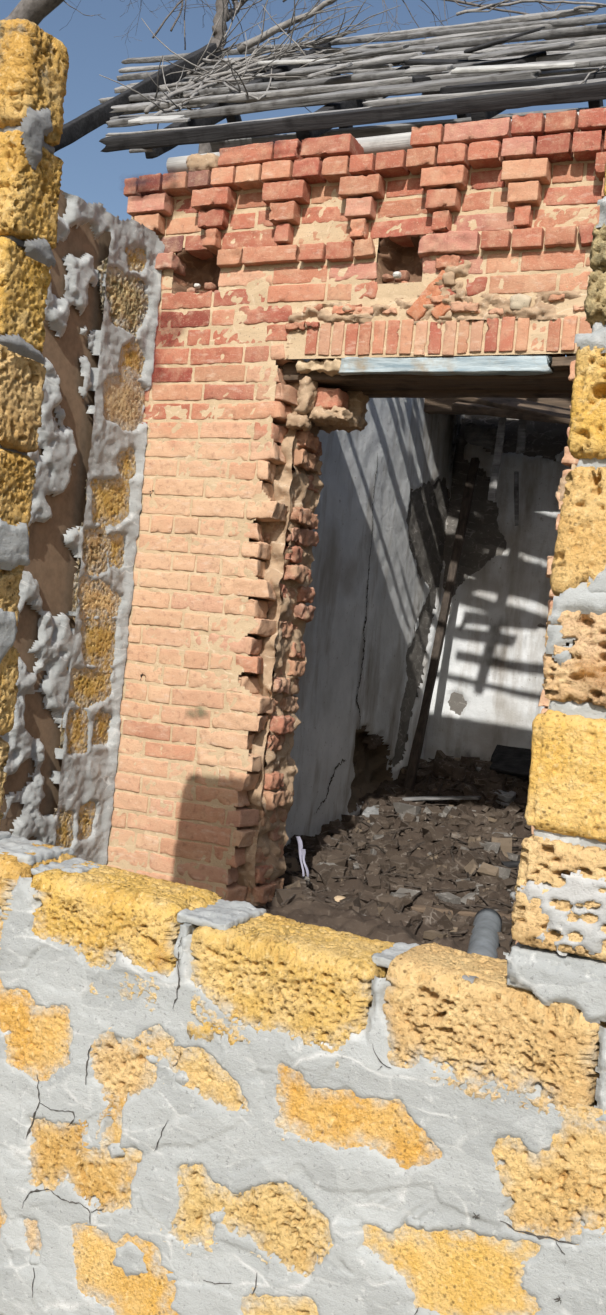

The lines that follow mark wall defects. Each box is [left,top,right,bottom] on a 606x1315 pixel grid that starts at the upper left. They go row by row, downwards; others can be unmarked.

spalling [285,235,584,359]
crack [356,455,378,729]
peeling [347,415,570,813]
crack [316,759,345,813]
crack [173,938,182,1007]
crack [26,1046,91,1138]